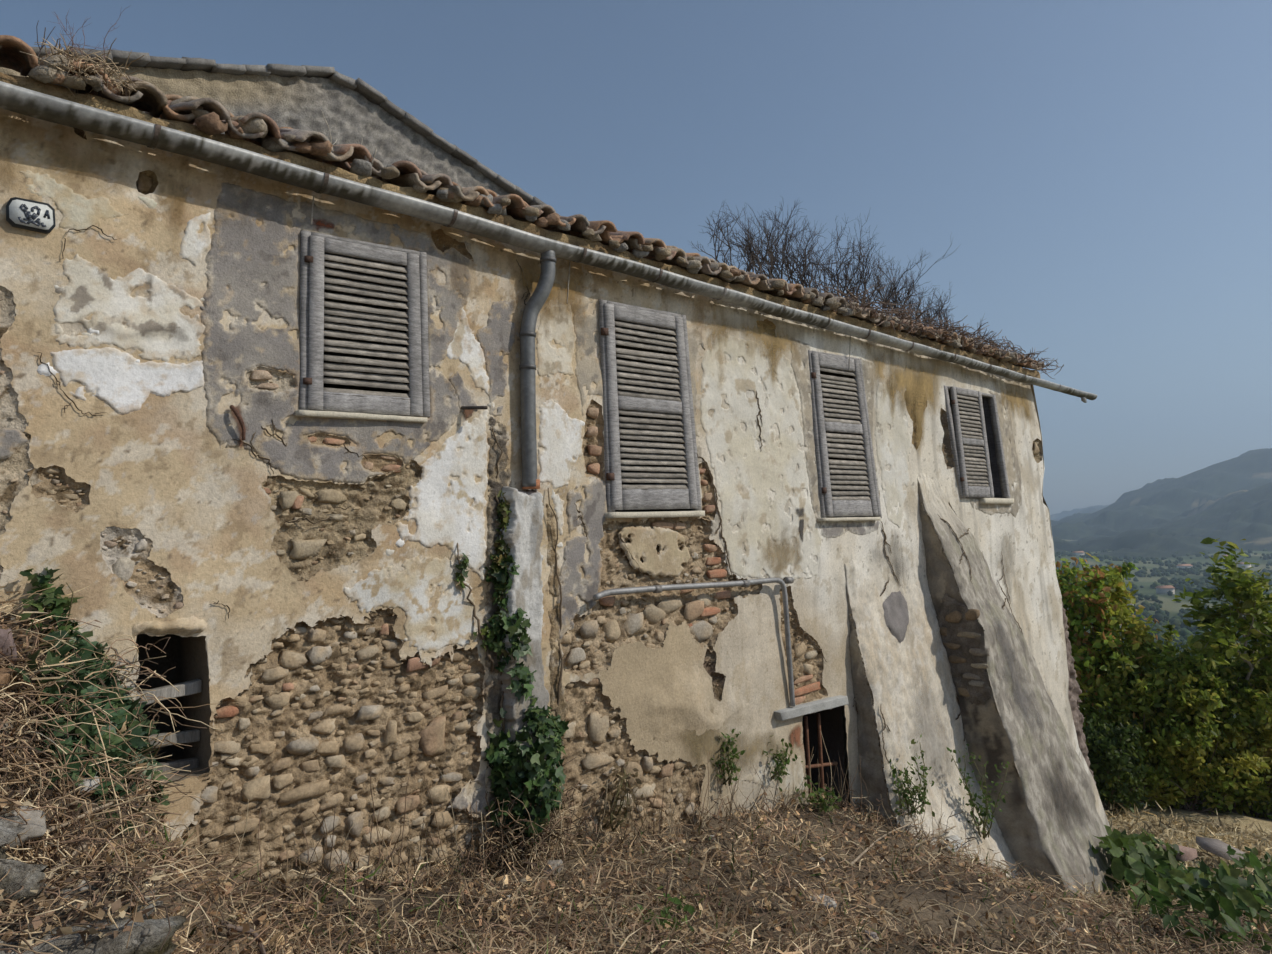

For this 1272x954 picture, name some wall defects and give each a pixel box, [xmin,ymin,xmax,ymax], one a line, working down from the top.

spalling [0,286,91,535]
crack [38,352,106,416]
peeling [37,254,205,414]
water stain [713,320,793,378]
crack [755,390,763,451]
water stain [875,358,938,446]
spalling [100,526,184,618]
spalling [172,304,828,883]
crack [880,522,899,596]
spalling [936,593,991,705]